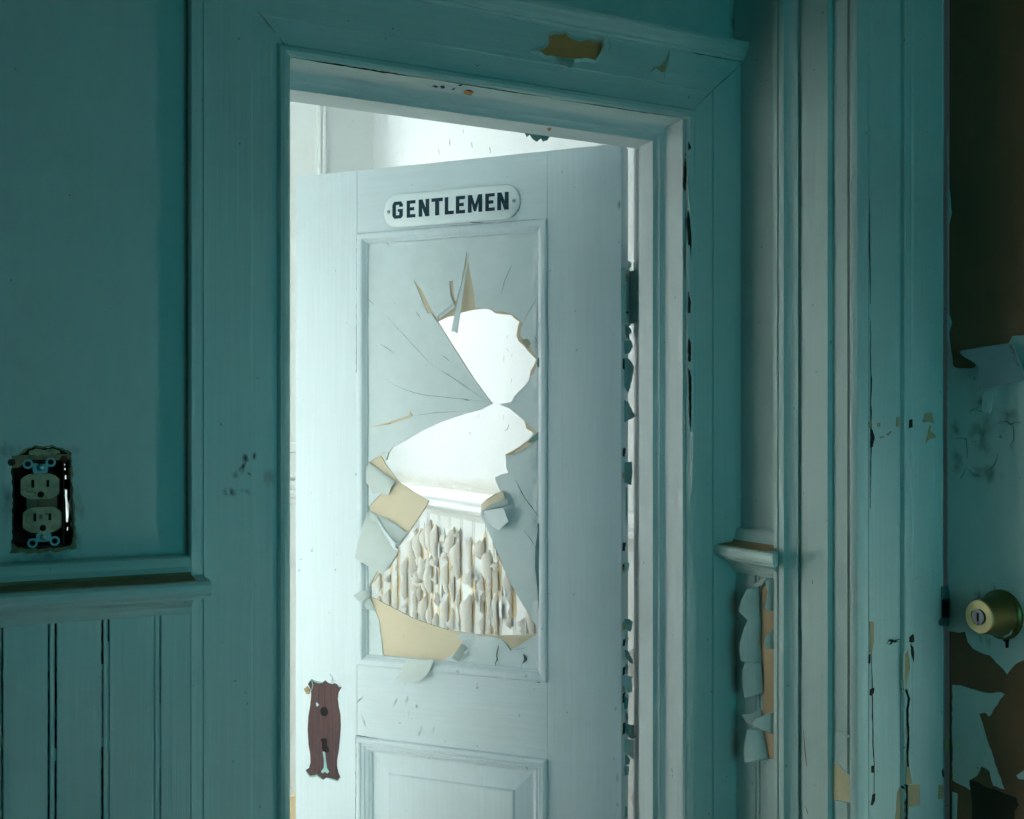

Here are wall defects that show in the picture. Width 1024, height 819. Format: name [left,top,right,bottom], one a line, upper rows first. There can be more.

peeling [528,30,612,68]
peeling [622,324,635,422]
crack [866,209,874,508]
peeling [622,448,633,516]
peeling [374,519,537,635]
peeling [622,619,636,776]
peeling [738,577,774,763]
crack [871,639,900,775]